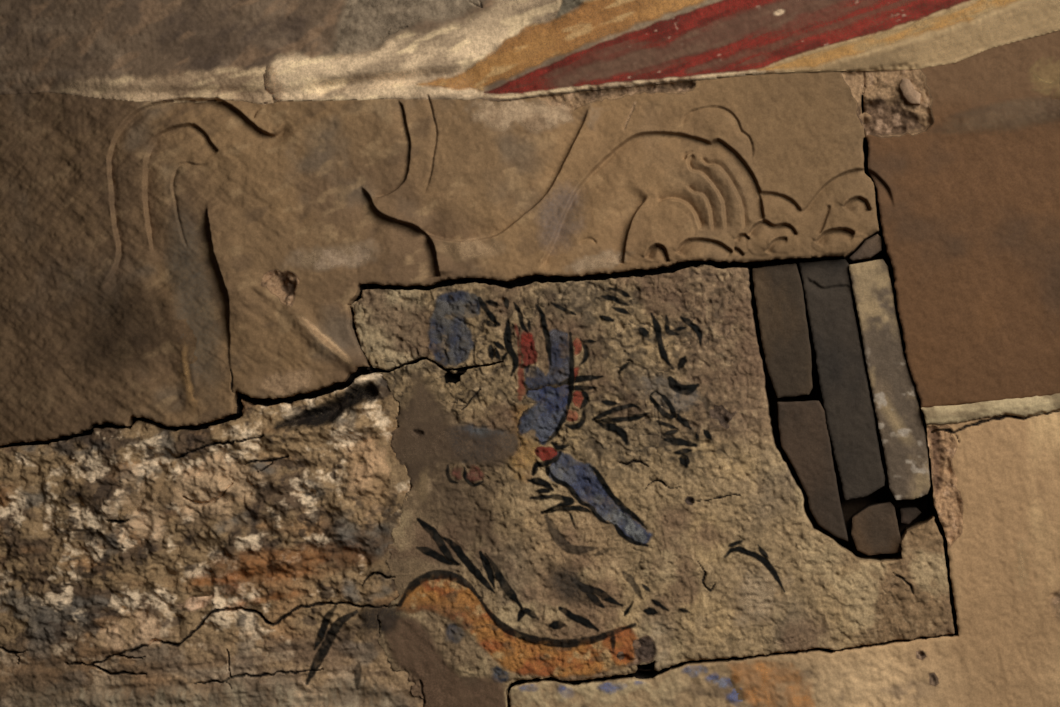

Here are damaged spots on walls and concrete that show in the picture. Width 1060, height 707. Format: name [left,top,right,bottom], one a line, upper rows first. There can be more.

spalling [841,69,934,138]
crack [353,257,848,330]
crack [0,357,503,472]
crack [66,572,395,675]
crack [195,649,323,687]